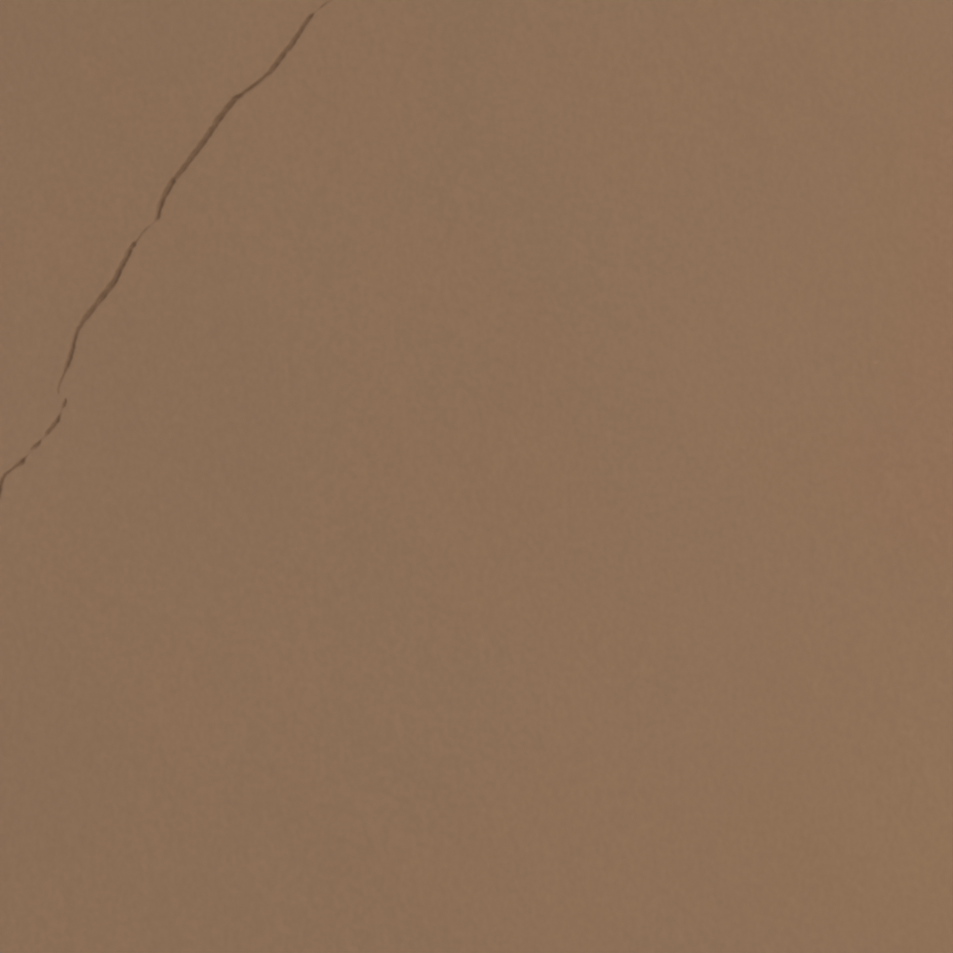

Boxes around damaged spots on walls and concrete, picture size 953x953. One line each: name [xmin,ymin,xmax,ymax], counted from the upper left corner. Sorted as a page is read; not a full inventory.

crack [0,0,331,494]